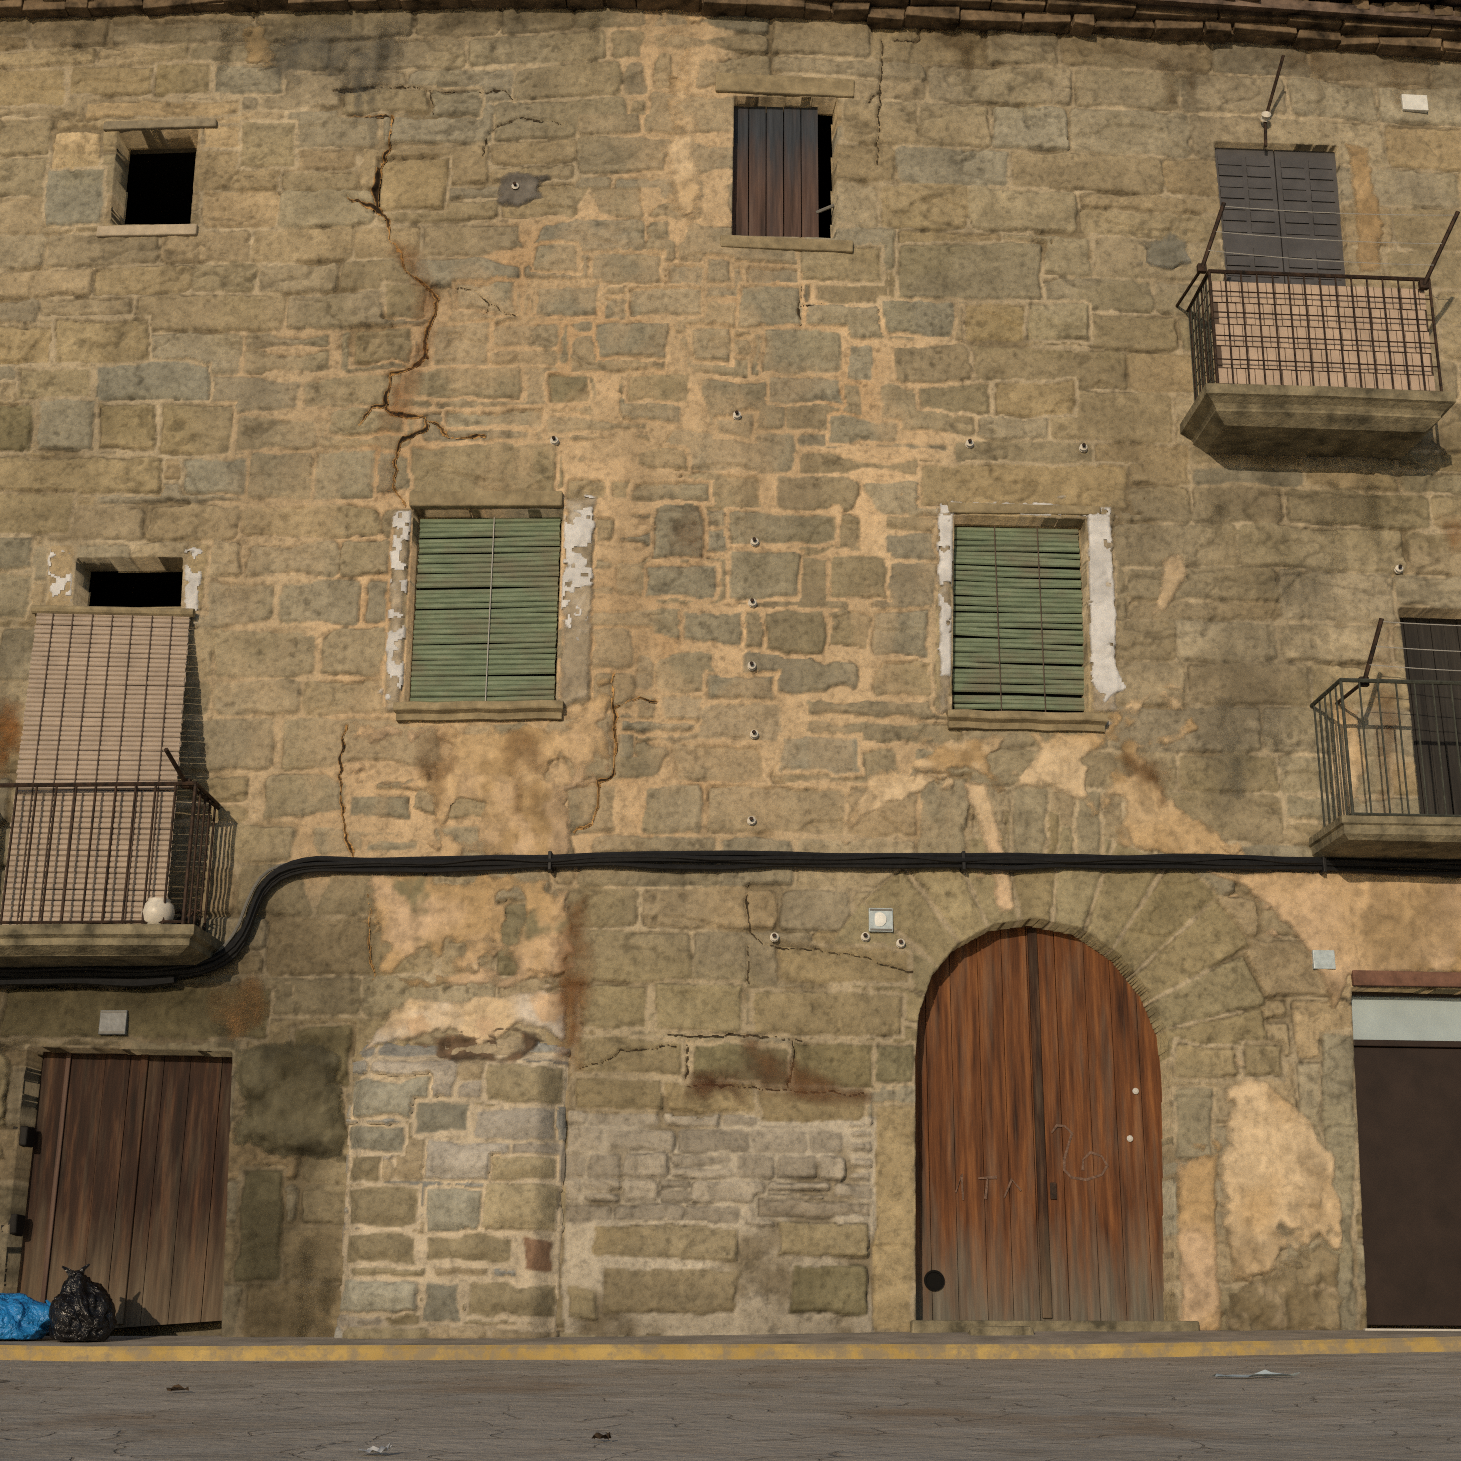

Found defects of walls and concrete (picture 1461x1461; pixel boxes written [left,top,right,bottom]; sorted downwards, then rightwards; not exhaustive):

crack [332,85,561,507]
peeling [390,510,411,593]
peeling [561,495,595,641]
peeling [379,609,405,700]
crack [338,724,355,857]
peeling [844,500,1461,1008]
crack [367,894,376,980]
peeling [1177,1062,1343,1330]